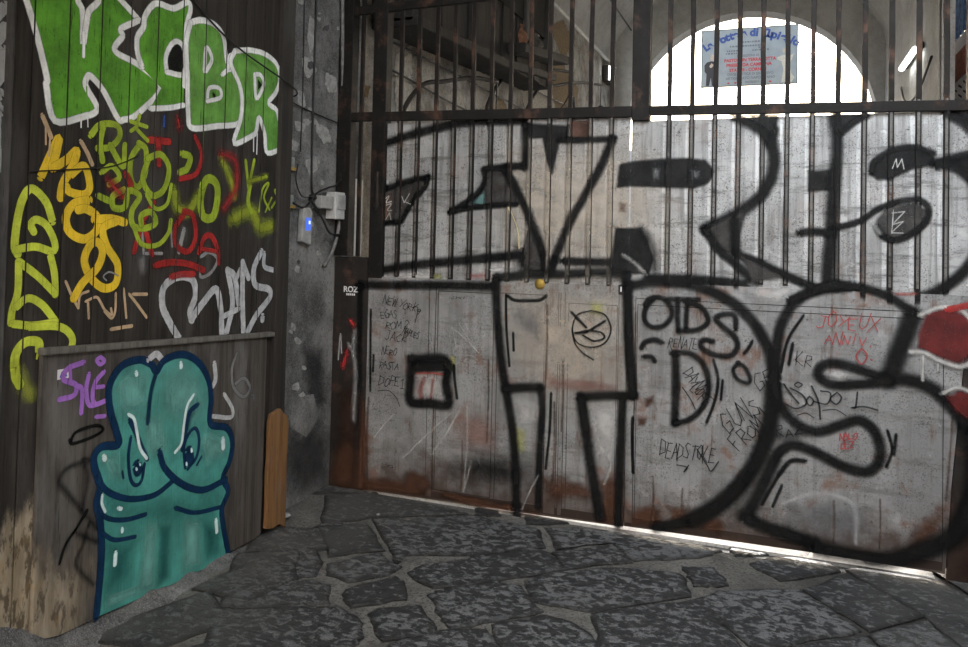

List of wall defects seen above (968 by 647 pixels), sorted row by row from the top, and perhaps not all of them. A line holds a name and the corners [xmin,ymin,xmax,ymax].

corrosion [335,386,538,516]
corrosion [542,309,589,499]
corrosion [601,480,687,527]